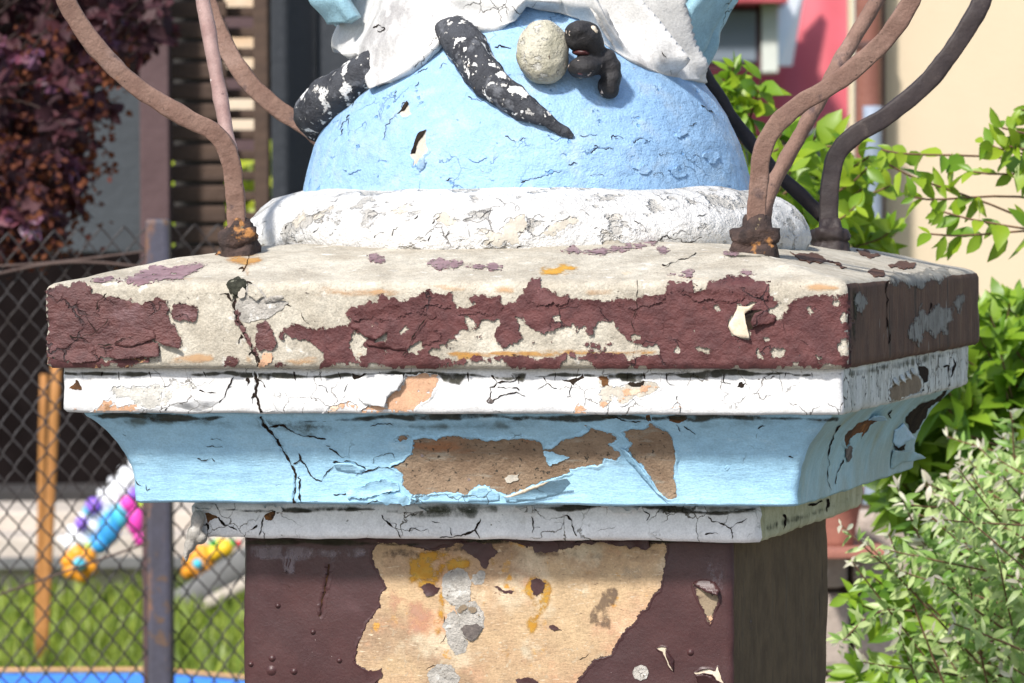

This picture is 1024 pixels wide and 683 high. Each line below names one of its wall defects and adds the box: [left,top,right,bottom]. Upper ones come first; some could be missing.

peeling [408,128,431,172]
peeling [476,212,671,256]
peeling [427,257,503,272]
peeling [45,262,208,392]
crack [199,255,481,539]
crack [467,373,572,402]
peeling [224,269,868,514]
peeling [841,359,948,469]
crack [531,515,615,536]
crack [705,517,746,538]
peeling [352,539,670,683]
peeling [655,645,674,672]